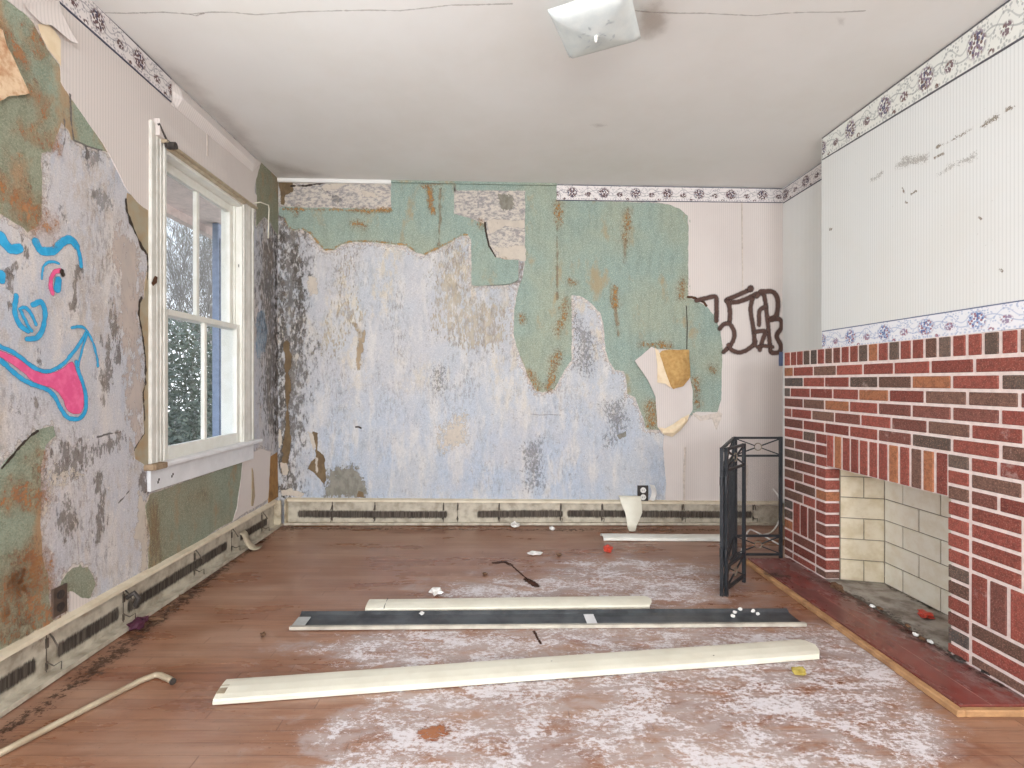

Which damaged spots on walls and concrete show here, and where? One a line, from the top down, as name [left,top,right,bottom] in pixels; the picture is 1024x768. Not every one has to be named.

rust [0,176,59,246]
flaking render [279,182,391,209]
flaking render [455,190,526,261]
flaking render [107,221,158,460]
water stain [254,214,320,498]
rust [527,350,562,394]
flaking render [308,432,326,483]
water stain [323,463,368,498]
flaking render [133,471,148,571]